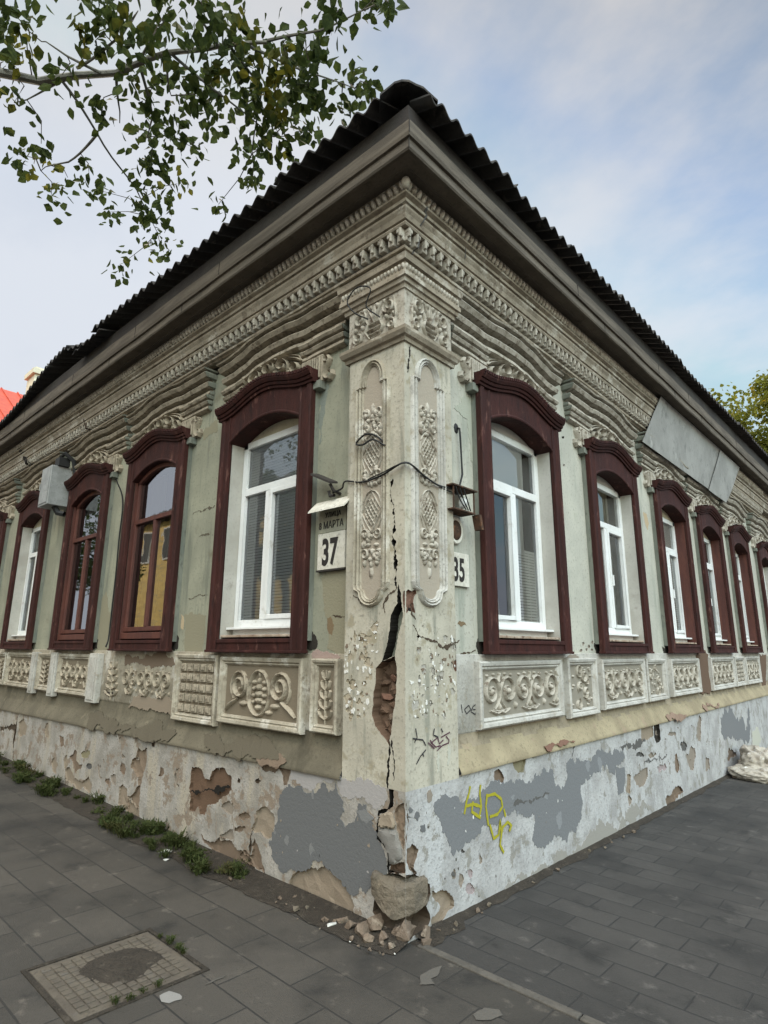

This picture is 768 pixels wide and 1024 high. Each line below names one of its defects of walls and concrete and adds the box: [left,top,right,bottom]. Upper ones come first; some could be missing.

crack [376,740,410,874]